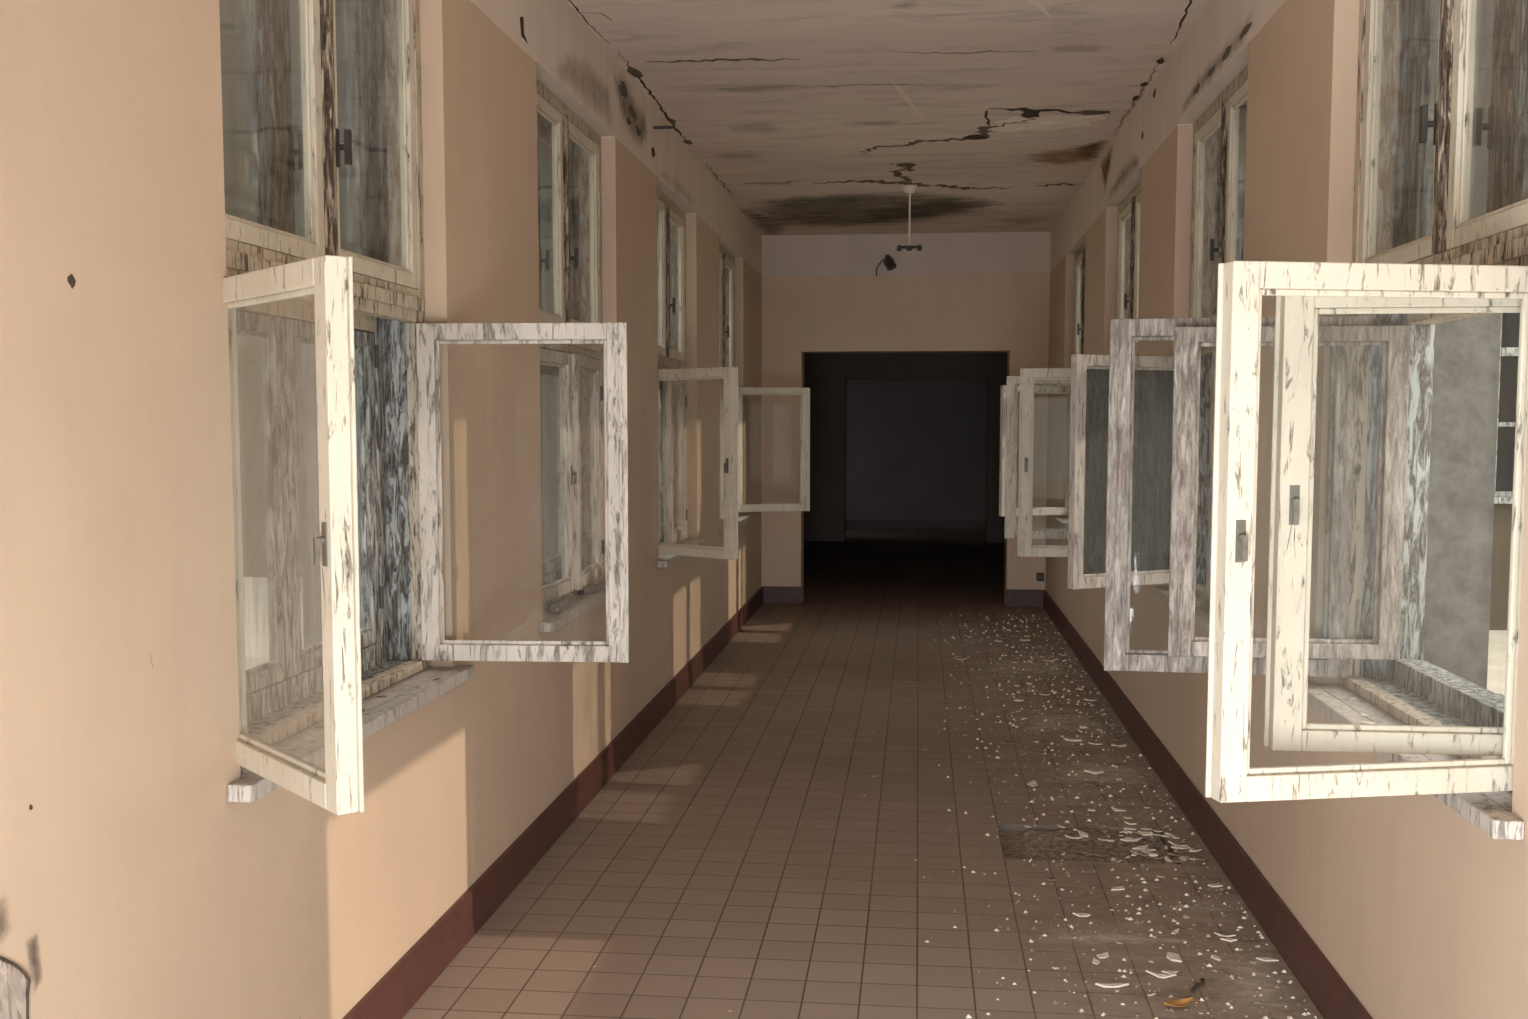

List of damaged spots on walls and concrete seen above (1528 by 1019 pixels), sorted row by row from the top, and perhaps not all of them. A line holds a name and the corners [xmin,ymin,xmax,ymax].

crack [568,0,1192,197]
leakage [757,195,975,230]
flaking render [0,940,39,1019]